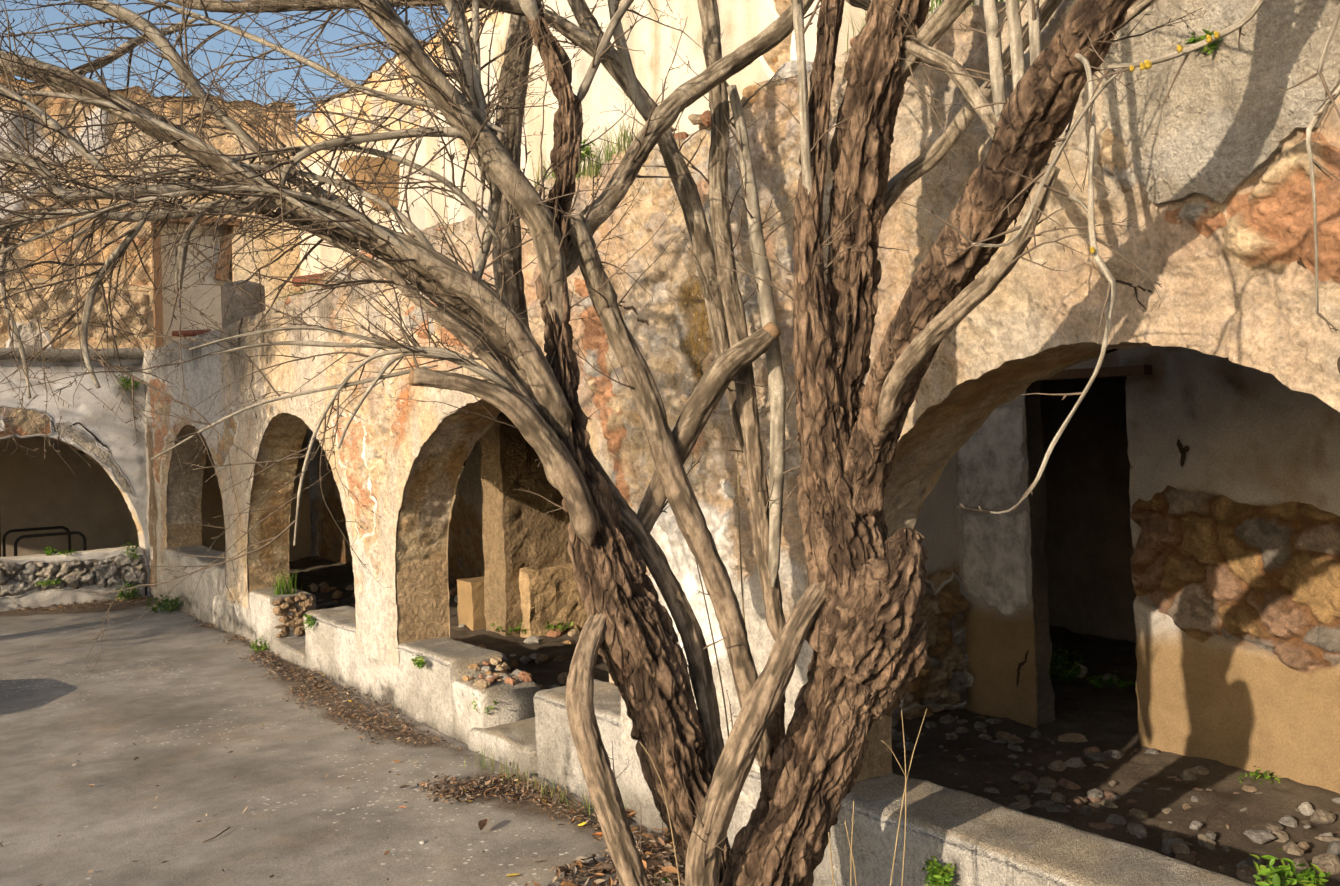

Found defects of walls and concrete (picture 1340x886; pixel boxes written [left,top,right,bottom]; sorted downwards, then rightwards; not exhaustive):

flaking render [1164,130,1340,283]
peeling [0,405,135,497]